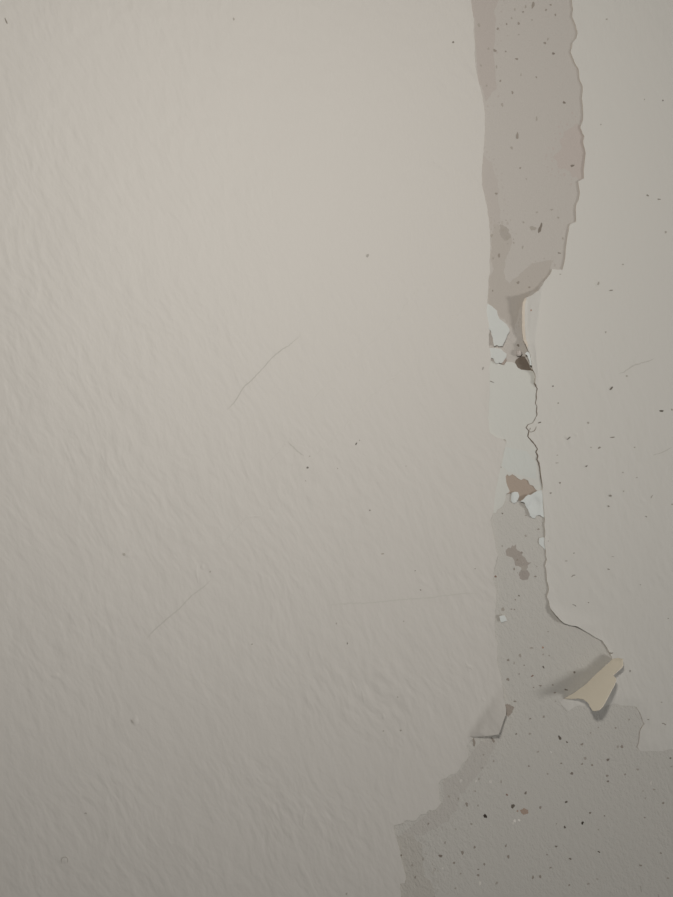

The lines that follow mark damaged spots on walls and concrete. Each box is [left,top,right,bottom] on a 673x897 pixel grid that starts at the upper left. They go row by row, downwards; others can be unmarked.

flaking render [474,0,583,369]
crack [526,378,542,484]
flaking render [394,474,673,897]